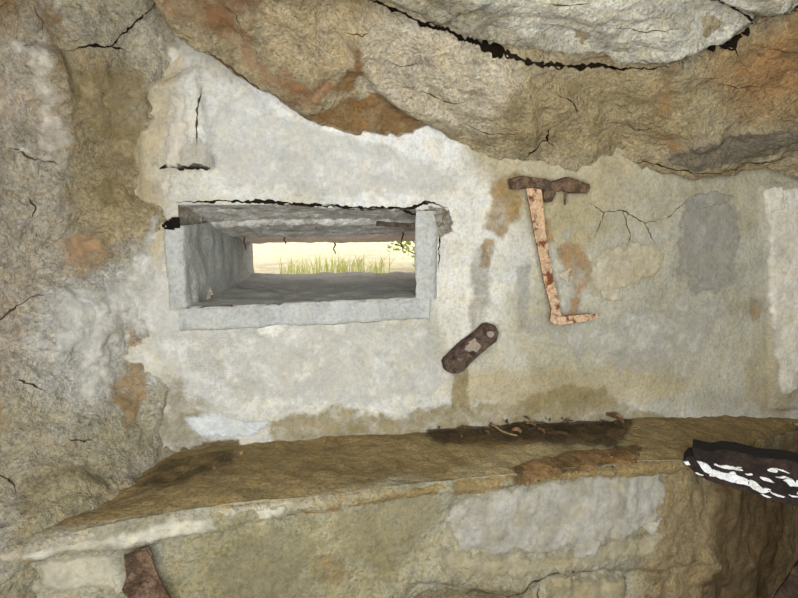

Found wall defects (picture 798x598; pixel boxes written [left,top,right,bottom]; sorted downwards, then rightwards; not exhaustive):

crack [64,3,156,52]
crack [368,0,676,72]
crack [707,0,798,56]
crack [194,49,260,90]